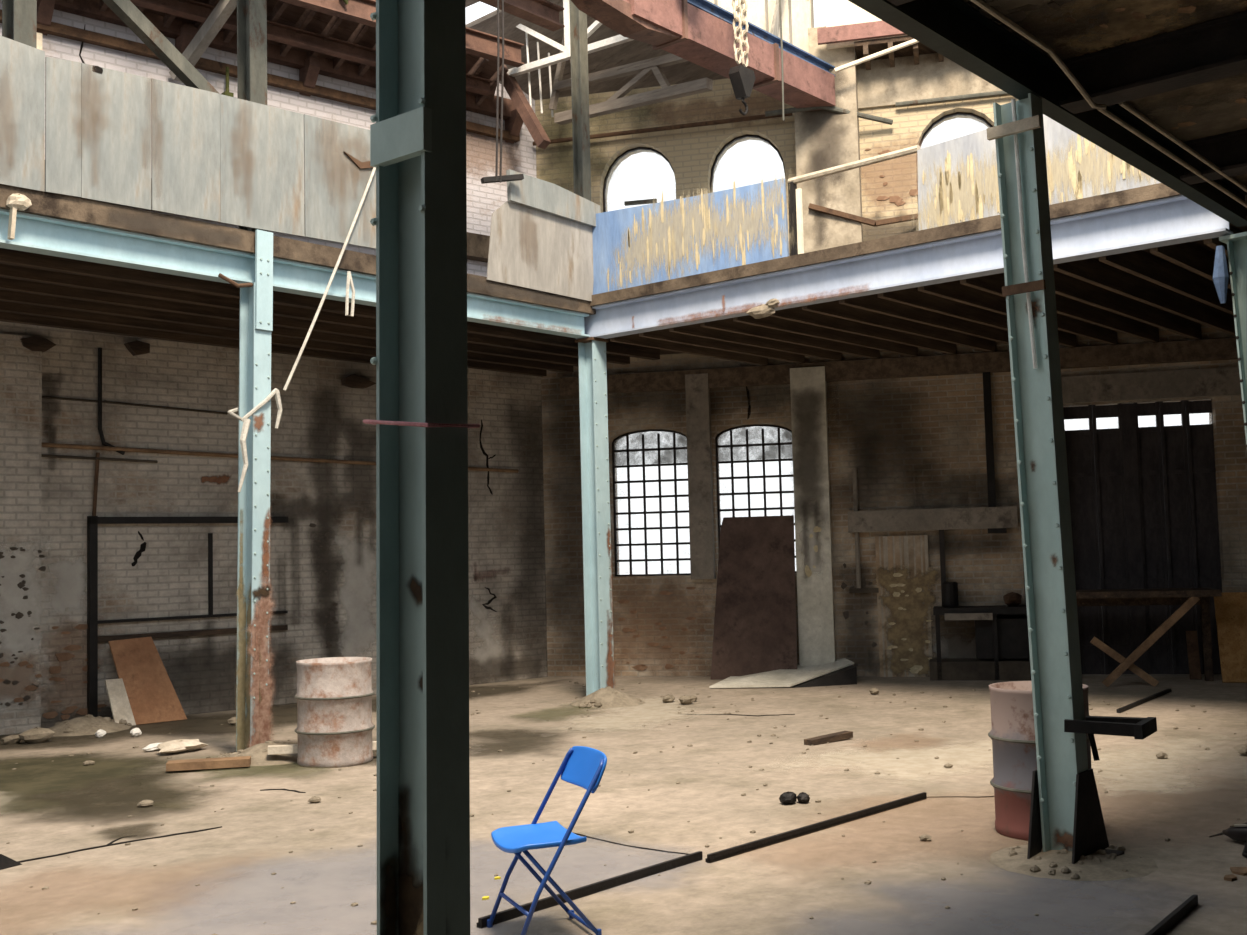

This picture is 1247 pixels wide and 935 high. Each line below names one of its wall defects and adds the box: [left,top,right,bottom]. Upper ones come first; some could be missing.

peeling [607,177,784,292]
peeling [877,150,1000,229]
peeling [1046,134,1156,204]
leakage [272,496,324,527]
leakage [345,424,376,527]
flaking render [0,547,99,707]
corrosion [236,512,274,751]
flaking render [841,563,877,668]